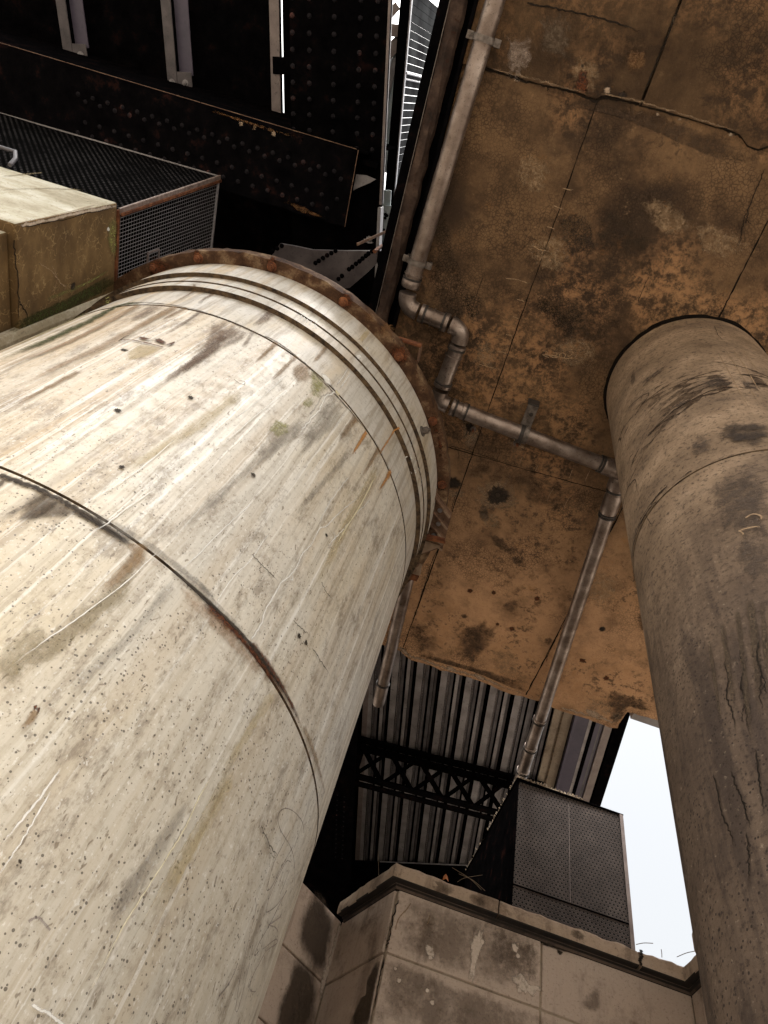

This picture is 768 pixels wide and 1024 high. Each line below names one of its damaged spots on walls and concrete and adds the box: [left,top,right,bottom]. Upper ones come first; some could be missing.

crack [485,7,768,249]
corrosion [150,259,169,276]
crack [724,641,766,726]
crack [713,751,764,876]
damp [278,898,341,1024]
crack [373,901,399,1008]